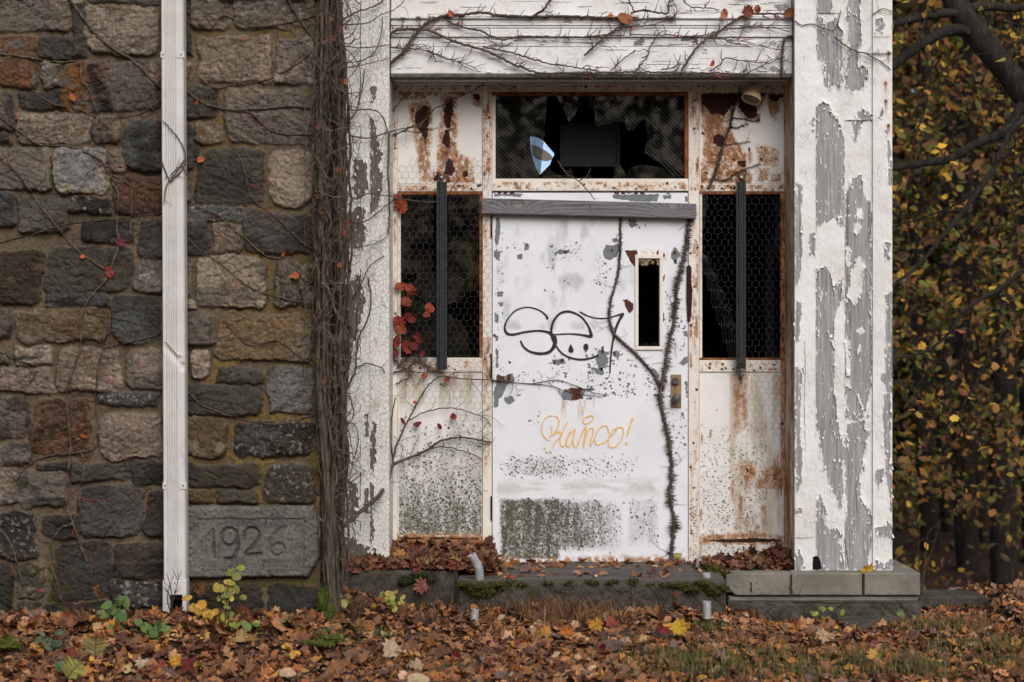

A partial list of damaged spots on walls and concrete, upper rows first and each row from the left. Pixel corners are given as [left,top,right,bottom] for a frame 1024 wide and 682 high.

peeling [347,116,384,252]
corrosion [394,85,516,190]
peeling [349,274,366,354]
peeling [493,217,688,455]
corrosion [498,85,785,553]
peeling [793,0,894,571]
peeling [345,413,377,556]